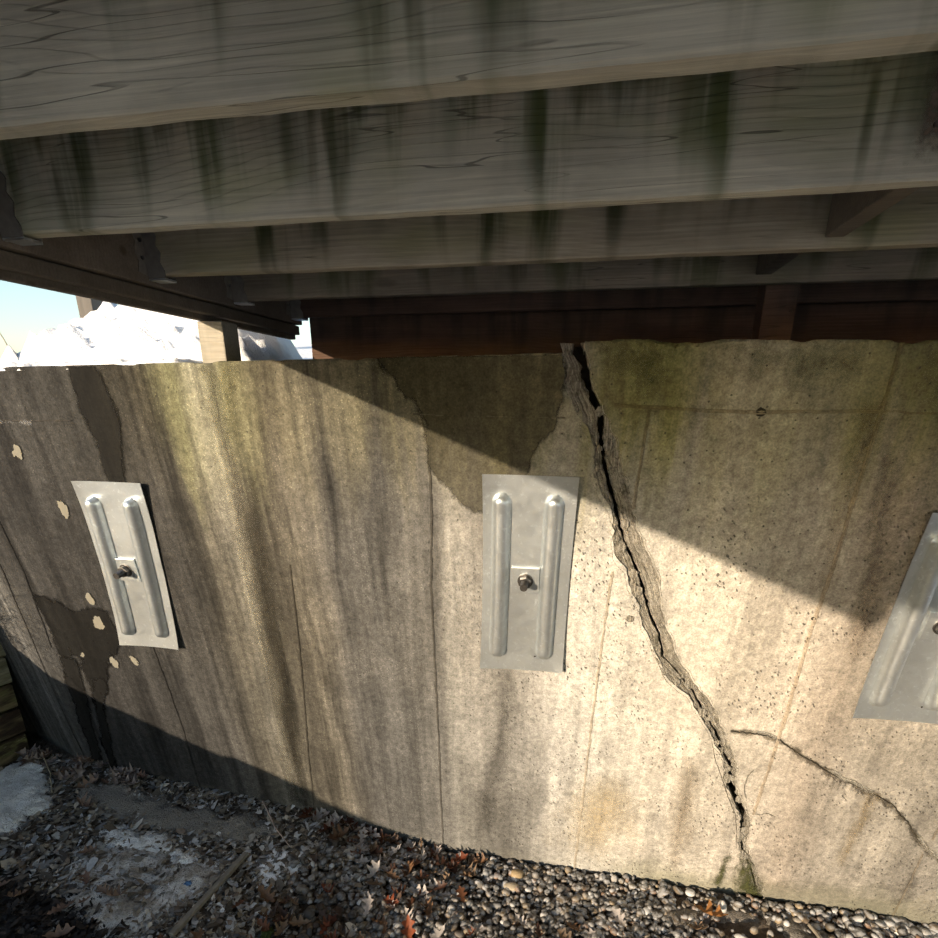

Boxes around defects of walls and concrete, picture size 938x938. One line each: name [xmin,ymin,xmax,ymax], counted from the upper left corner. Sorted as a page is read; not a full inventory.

leakage [33,595,120,768]
crack [560,343,938,899]